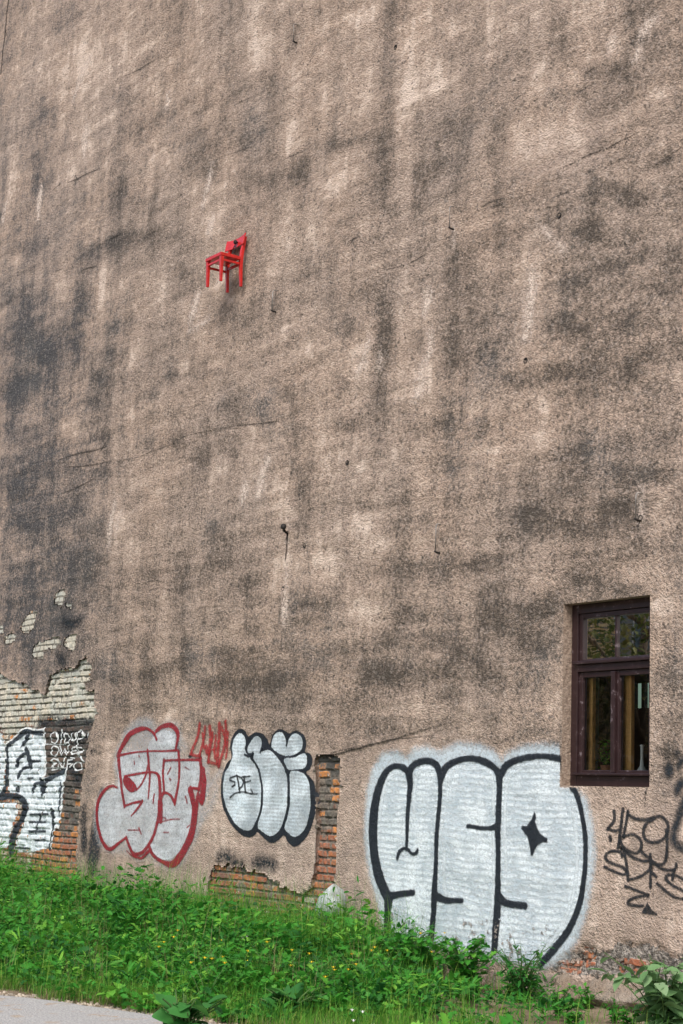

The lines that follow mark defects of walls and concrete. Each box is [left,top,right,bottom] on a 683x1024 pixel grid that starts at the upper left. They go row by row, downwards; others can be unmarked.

crack [59,419,277,493]
spalling [0,610,36,644]
spalling [54,589,72,609]
spalling [0,634,98,884]
spalling [210,753,343,923]